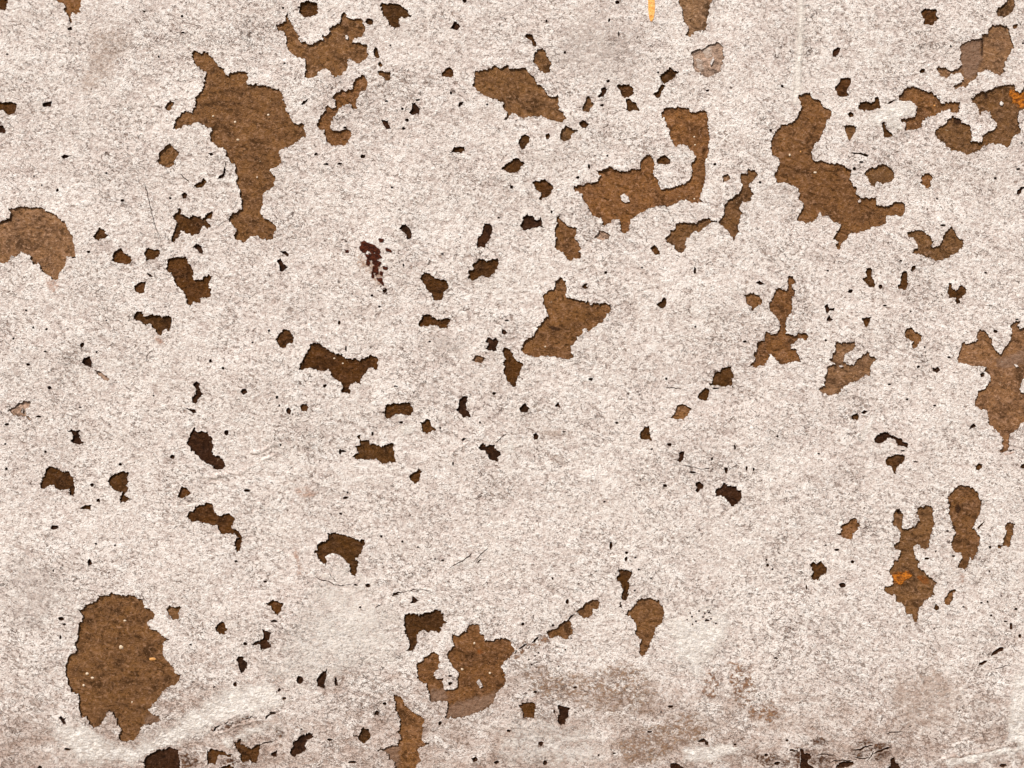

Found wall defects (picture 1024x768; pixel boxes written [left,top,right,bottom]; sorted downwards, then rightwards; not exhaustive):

peeling [112,0,412,306]
peeling [472,33,640,141]
peeling [573,67,716,240]
peeling [770,0,1024,250]
peeling [0,206,90,280]
peeling [299,342,379,394]
peeling [472,277,611,387]
peeling [743,276,809,368]
peeling [932,318,1024,453]
rust [892,571,928,585]
peeling [58,592,181,742]
peeling [403,596,515,725]